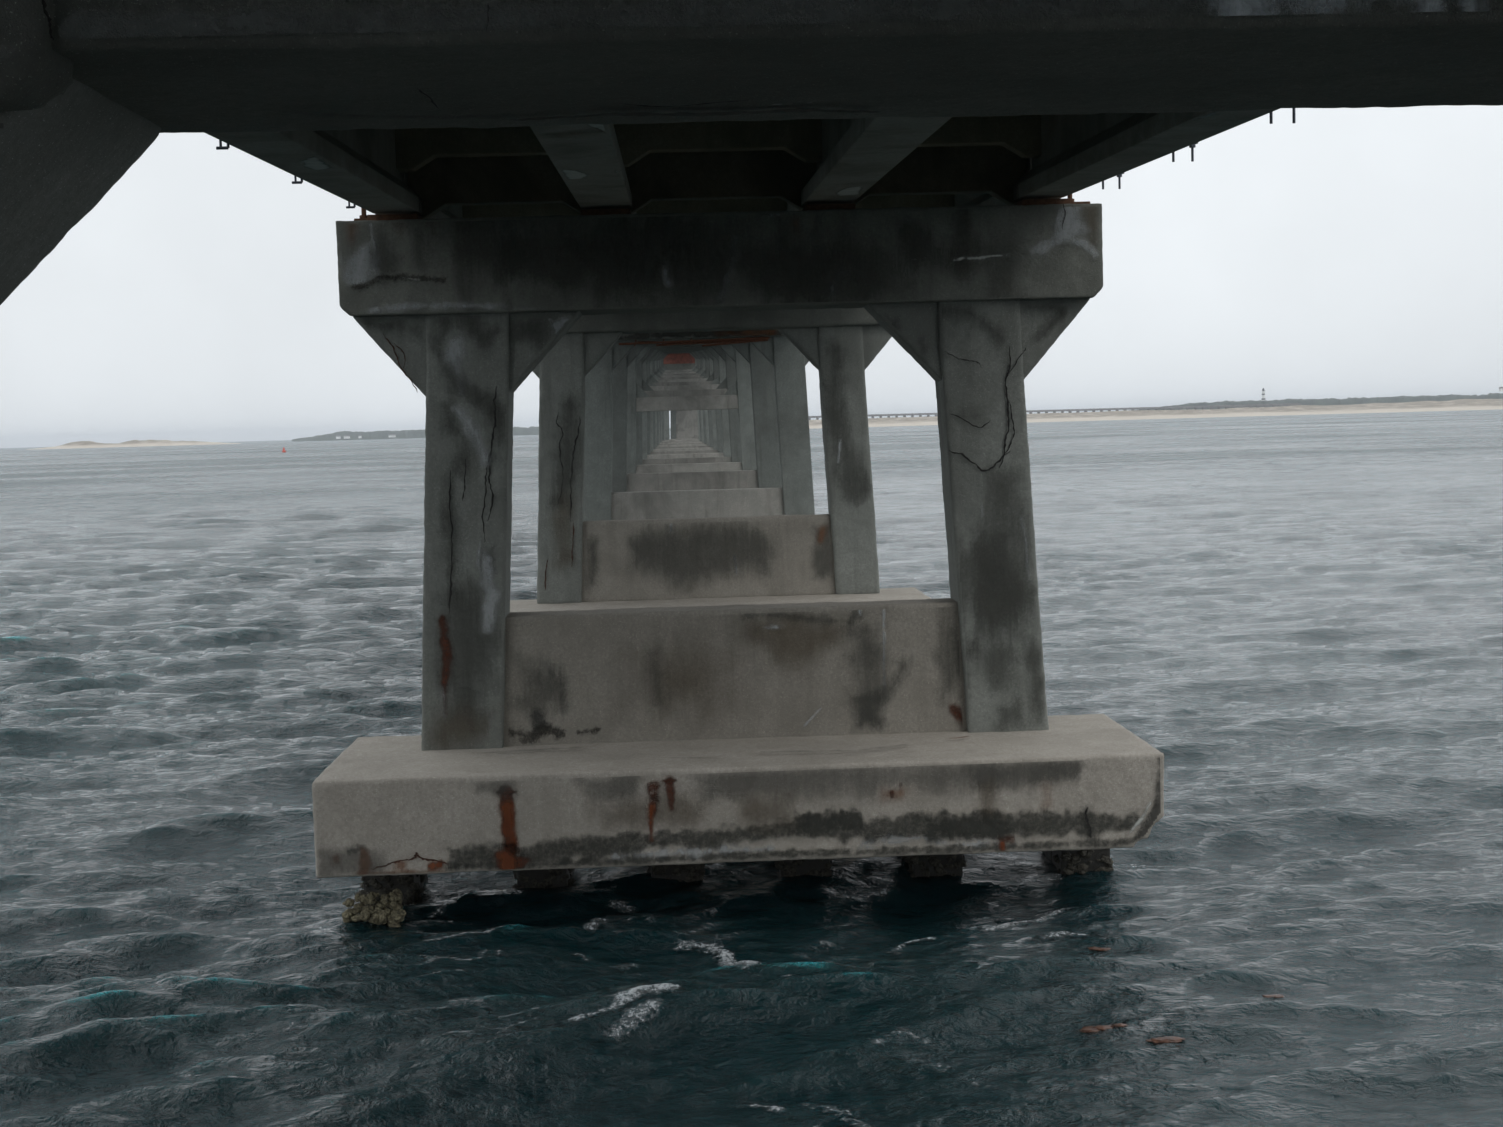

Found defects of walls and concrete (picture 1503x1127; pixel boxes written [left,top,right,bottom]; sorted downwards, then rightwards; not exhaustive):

damp [1221,0,1273,16]
crack [945,345,1026,472]
crack [449,386,497,613]
rust [439,615,452,703]
rust [496,785,528,870]
rust [647,777,677,841]
damp [447,809,1140,870]